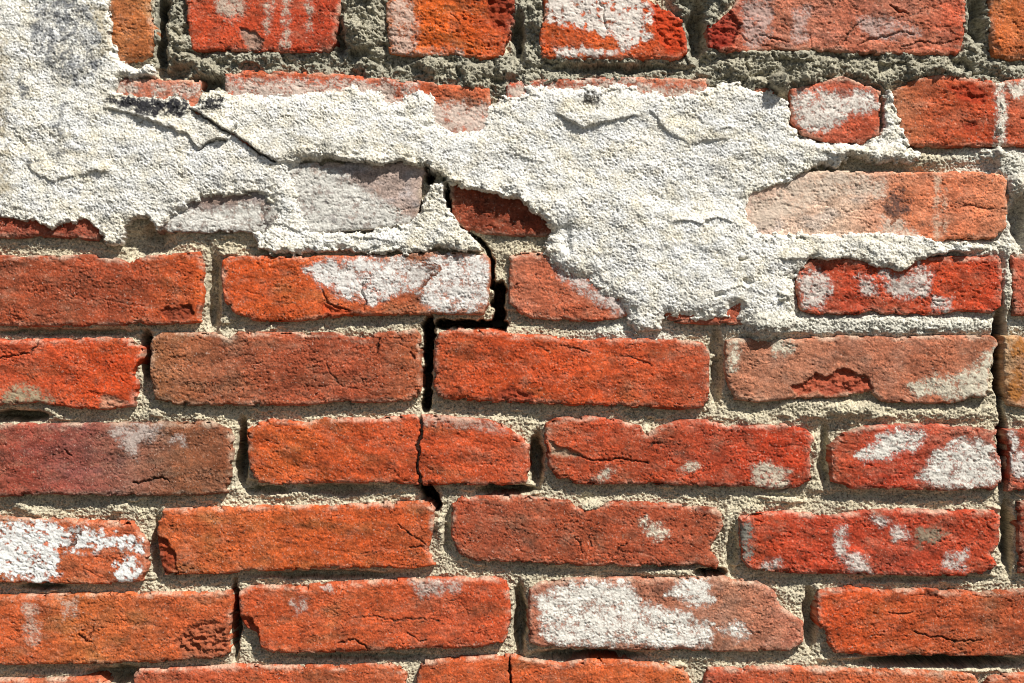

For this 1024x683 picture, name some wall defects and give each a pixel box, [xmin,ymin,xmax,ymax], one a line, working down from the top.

peeling [545,0,687,59]
peeling [104,93,447,174]
peeling [556,96,643,126]
damp [790,86,881,134]
crack [427,176,451,209]
peeling [408,190,473,251]
damp [303,252,489,314]
peeling [782,237,936,268]
crack [413,241,507,409]
damp [853,426,1024,491]
crack [422,483,442,507]
damp [532,577,752,649]